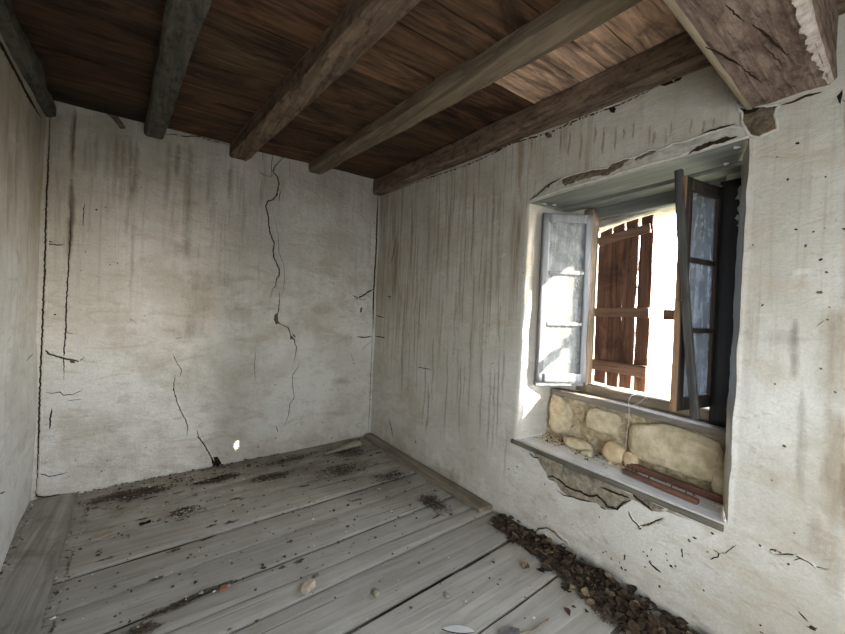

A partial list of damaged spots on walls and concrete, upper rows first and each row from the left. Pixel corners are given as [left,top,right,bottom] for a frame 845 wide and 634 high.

spalling [388,77,682,195]
spalling [530,92,821,206]
crack [0,41,85,494]
crack [259,154,299,422]
crack [173,355,222,467]
spalling [530,452,687,519]
crack [770,549,829,571]